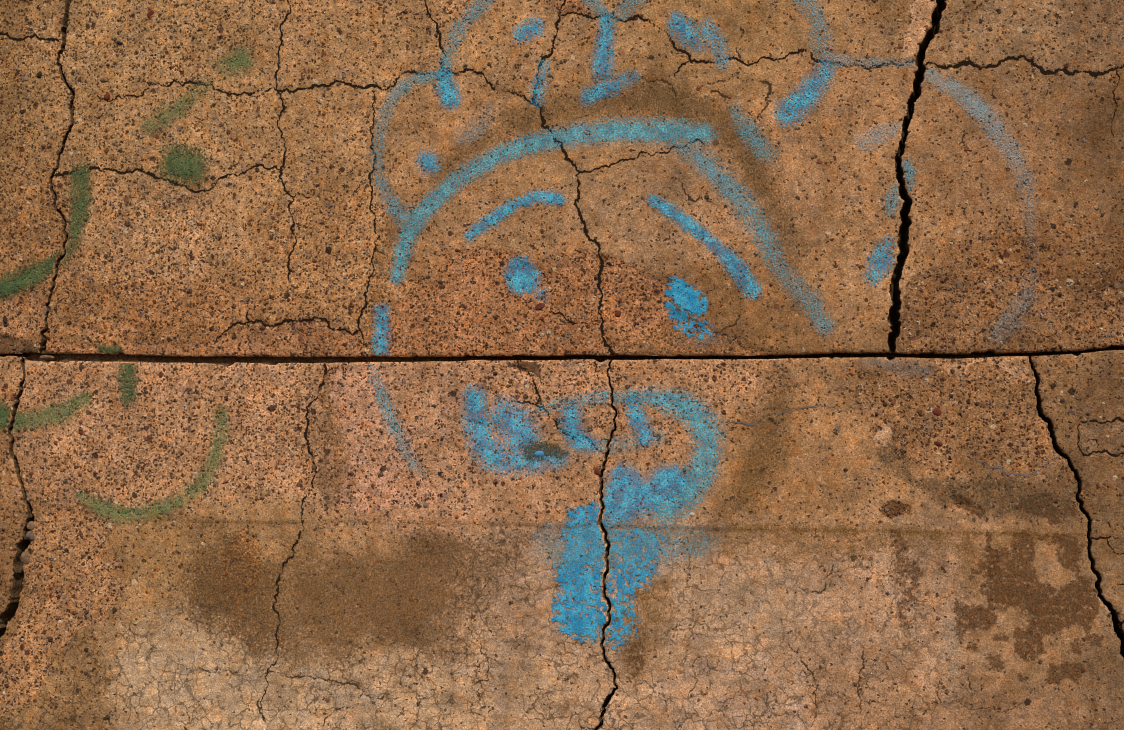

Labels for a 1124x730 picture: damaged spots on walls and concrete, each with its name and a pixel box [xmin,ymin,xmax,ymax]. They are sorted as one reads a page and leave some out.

crack [0,0,498,357]
crack [0,357,38,644]
crack [199,363,398,725]
damp [184,535,523,669]
crack [506,0,1124,730]